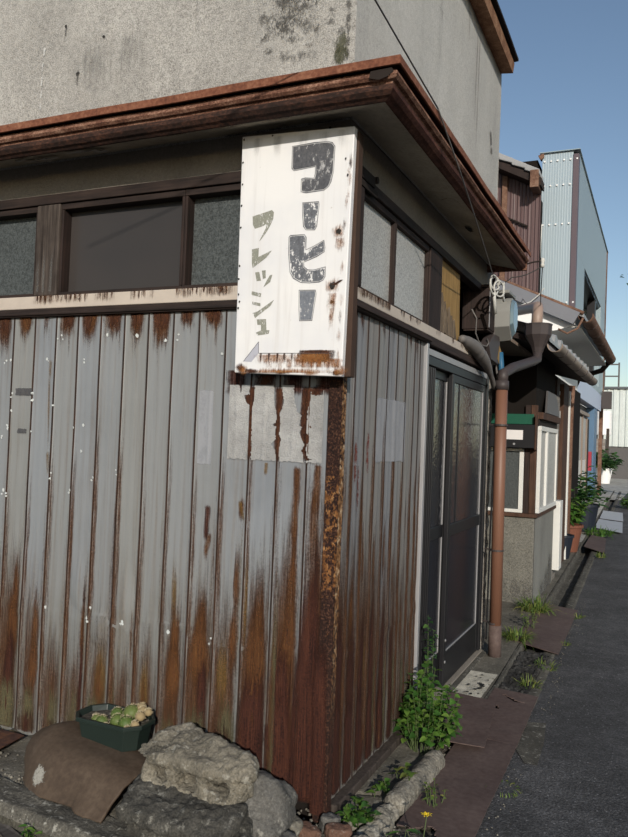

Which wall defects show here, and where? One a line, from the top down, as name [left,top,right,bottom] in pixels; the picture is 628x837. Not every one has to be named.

damp [259,0,319,54]
damp [329,0,351,59]
corrosion [176,286,231,295]
corrosion [0,318,31,348]
corrosion [60,314,121,340]
corrosion [130,312,171,345]
corrosion [181,310,222,339]
corrosion [0,350,345,802]
corrosion [331,434,420,794]